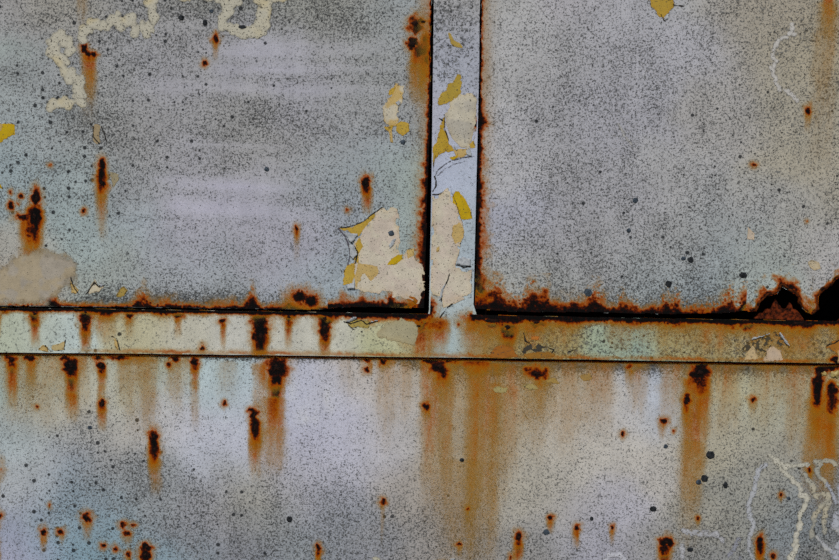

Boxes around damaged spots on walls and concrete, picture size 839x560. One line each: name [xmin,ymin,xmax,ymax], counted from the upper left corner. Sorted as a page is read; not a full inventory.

peeling [648,0,684,22]
peeling [383,83,409,143]
peeling [433,74,477,162]
corrosion [0,0,608,463]
peeling [338,188,472,318]
corrosion [457,0,839,469]
corrosion [147,427,161,473]
corrosion [509,529,523,560]